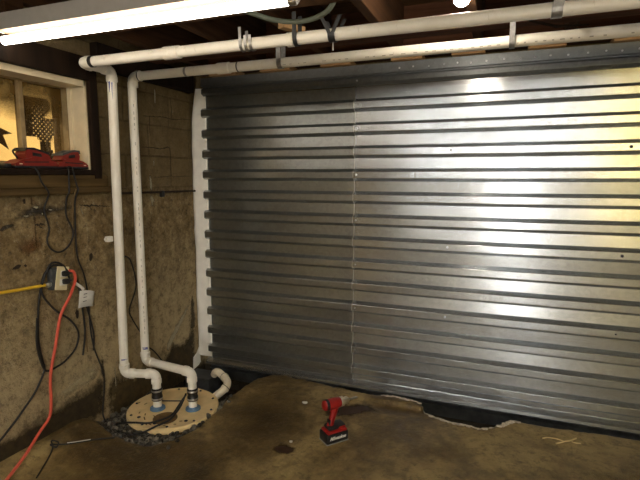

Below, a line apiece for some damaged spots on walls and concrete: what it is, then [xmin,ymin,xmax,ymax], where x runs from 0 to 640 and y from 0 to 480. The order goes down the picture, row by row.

damp [164,299,196,370]
damp [145,367,185,390]
spalling [381,395,521,430]
damp [273,445,294,454]